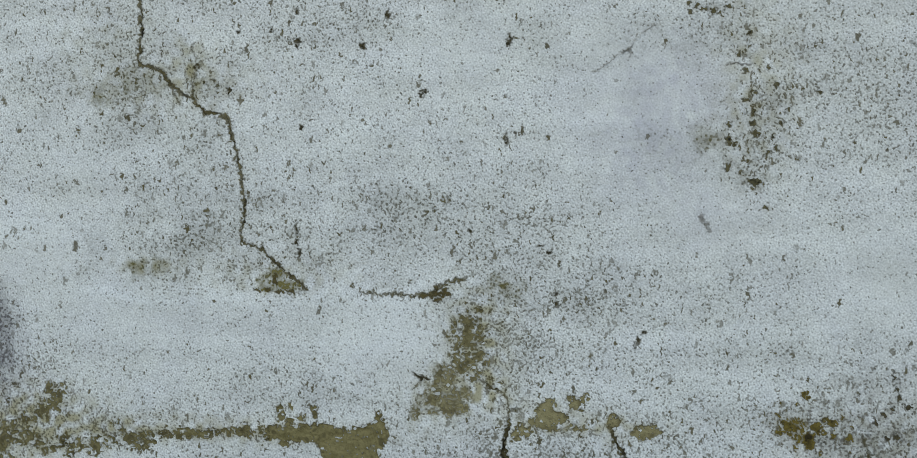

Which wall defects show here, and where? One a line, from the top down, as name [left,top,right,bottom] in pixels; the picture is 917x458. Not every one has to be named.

crack [136,0,308,291]
crack [362,277,467,299]
peeling [410,306,503,421]
peeling [0,380,390,458]
crack [481,380,521,458]
peeling [510,392,590,443]
peeling [606,413,621,431]
crack [609,427,627,458]
peeling [630,424,663,441]